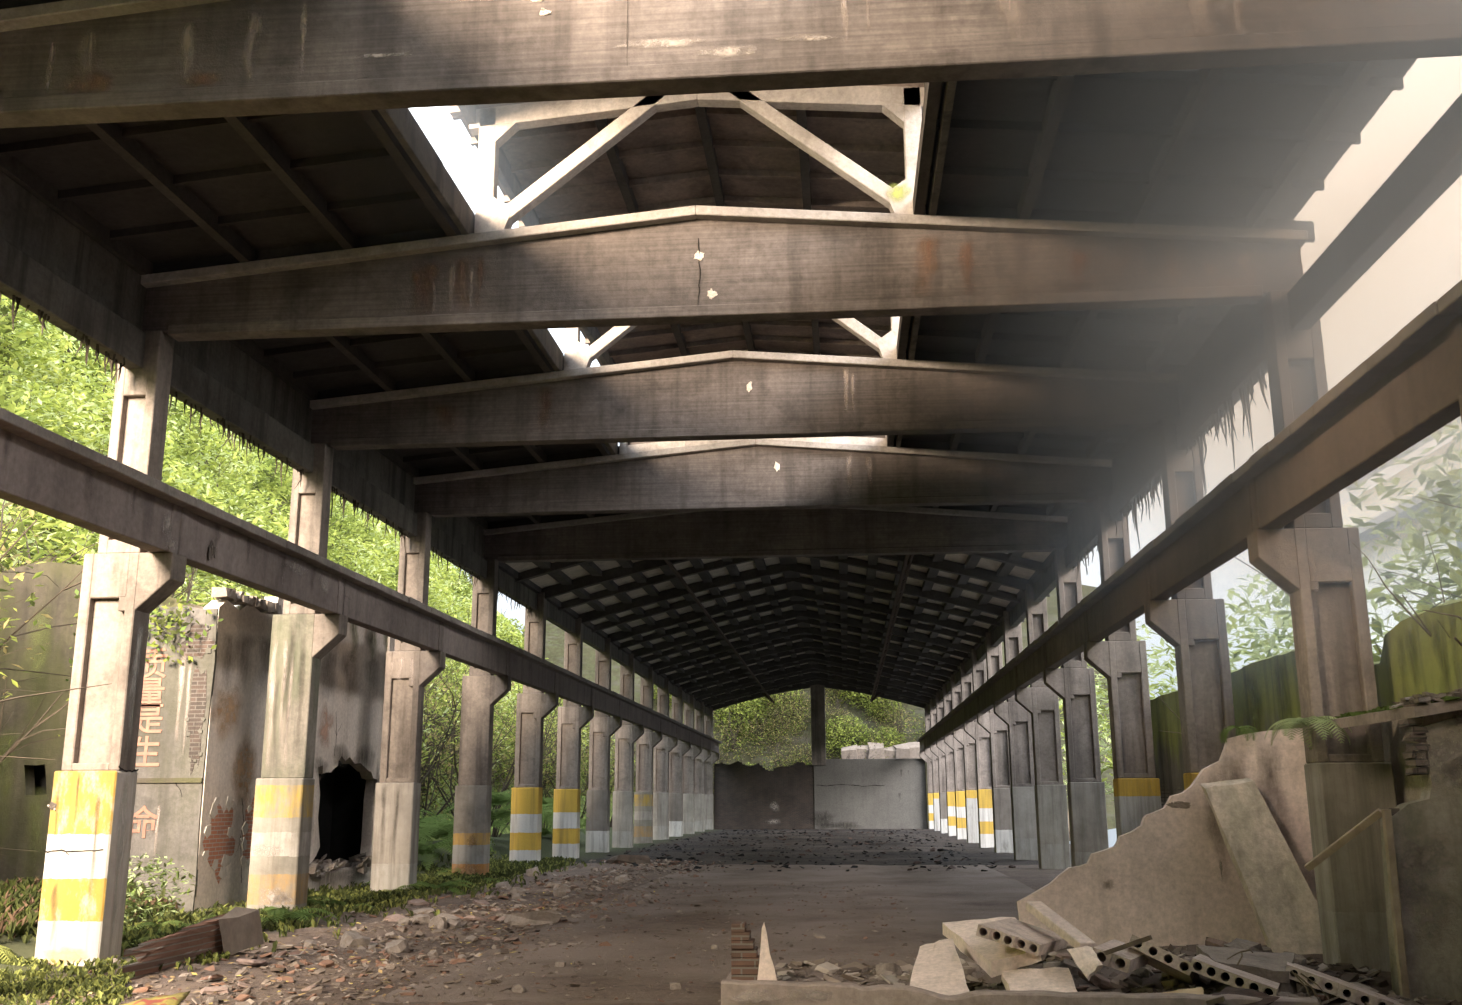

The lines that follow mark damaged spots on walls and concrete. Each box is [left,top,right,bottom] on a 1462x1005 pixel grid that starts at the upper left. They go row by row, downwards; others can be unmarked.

crack [43,849,103,857]
flaking render [202,748,271,884]
spalling [1166,801,1191,809]
spalling [122,892,334,993]